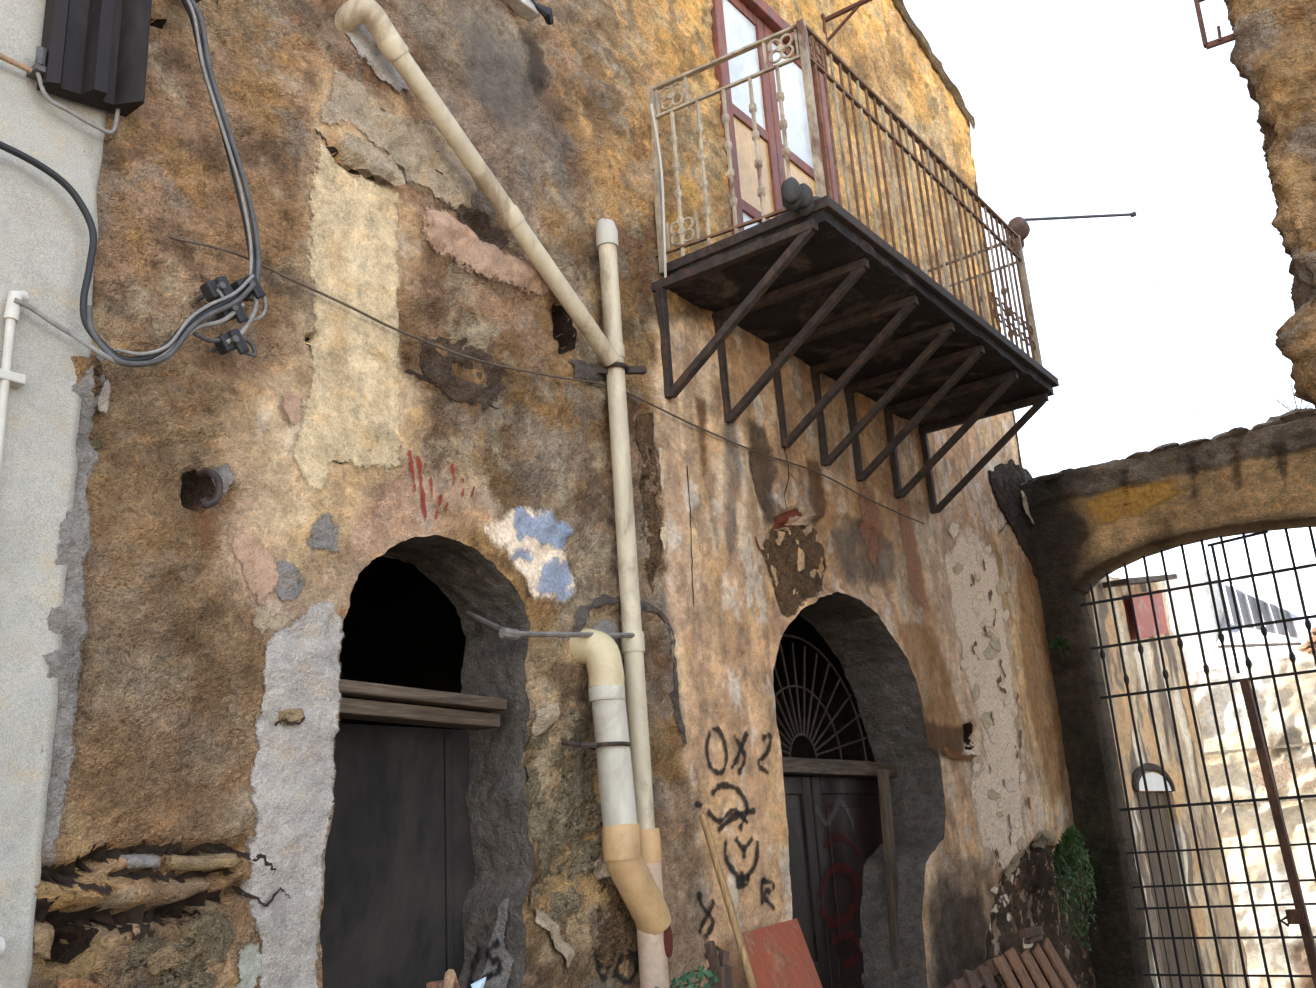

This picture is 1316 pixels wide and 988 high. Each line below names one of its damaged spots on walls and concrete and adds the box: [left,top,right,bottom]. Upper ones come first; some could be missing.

flaking render [345,23,410,92]
leakage [527,39,545,87]
flaking render [283,69,510,492]
flaking render [41,354,111,868]
peeling [485,506,574,602]
spalling [757,508,826,618]
peeling [278,708,304,725]
flaking render [942,522,1094,988]
crack [33,836,290,960]